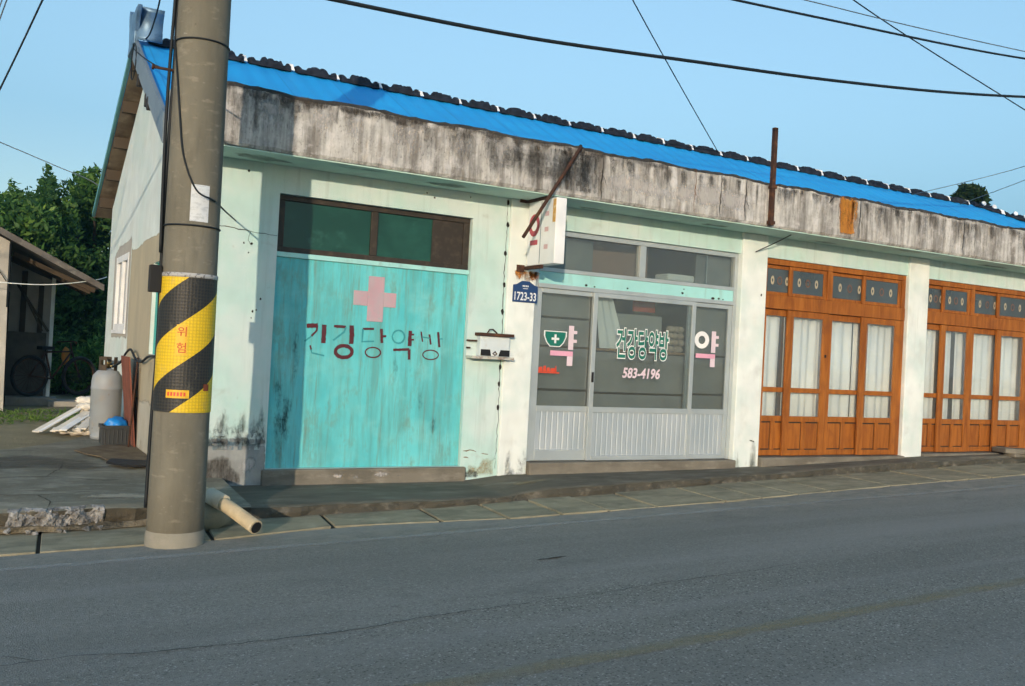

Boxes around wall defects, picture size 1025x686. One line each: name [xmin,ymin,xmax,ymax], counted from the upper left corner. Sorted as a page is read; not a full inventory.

leakage [240,88,432,147]
leakage [446,125,745,209]
rust [839,196,858,234]
leakage [208,416,264,446]
spalling [3,504,106,535]